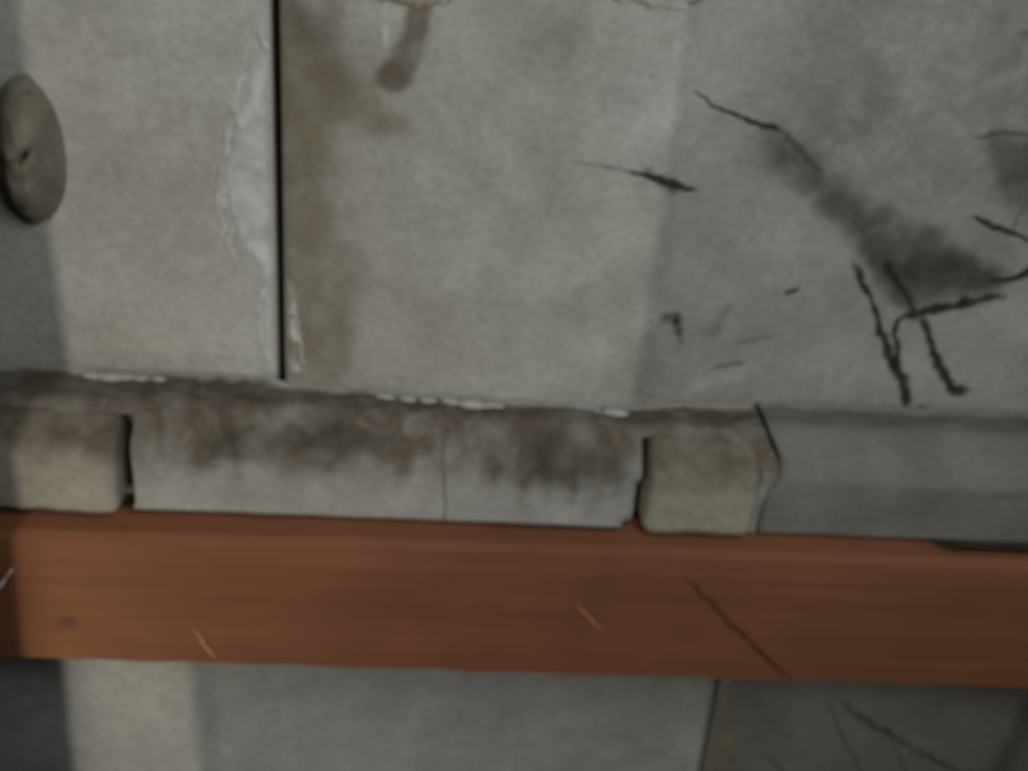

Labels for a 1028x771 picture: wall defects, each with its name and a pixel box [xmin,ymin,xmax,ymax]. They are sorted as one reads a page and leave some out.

crack [382,0,451,8]
crack [696,92,818,168]
crack [585,163,695,192]
crack [975,209,1028,242]
damp [825,191,990,298]
crack [856,263,1000,408]
damp [376,393,506,409]
damp [591,407,629,416]